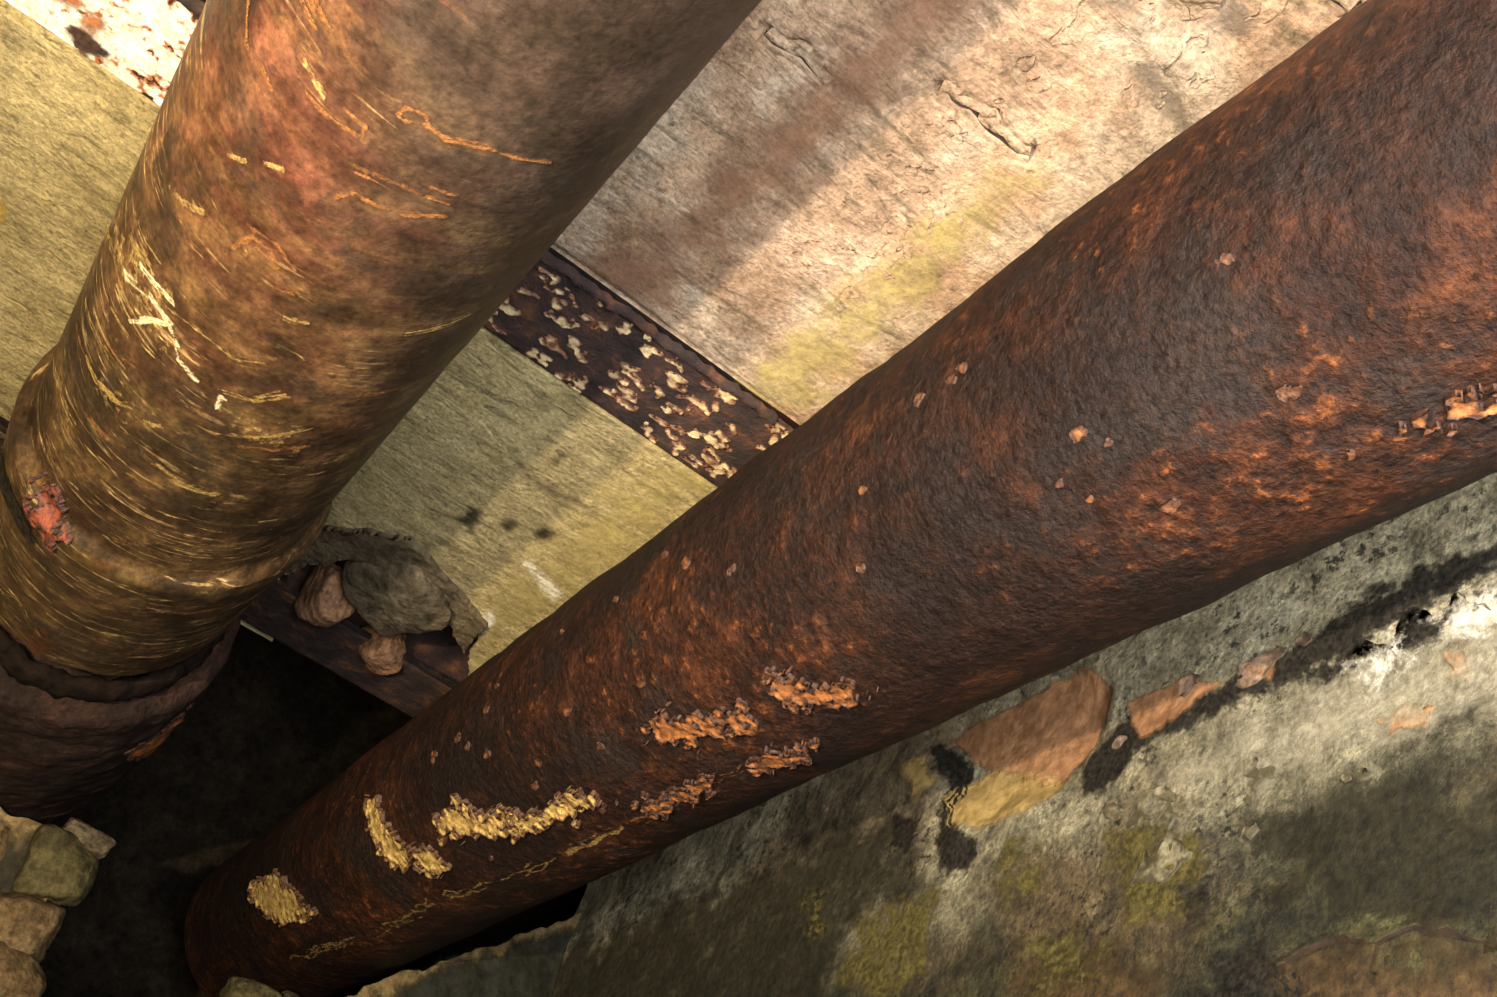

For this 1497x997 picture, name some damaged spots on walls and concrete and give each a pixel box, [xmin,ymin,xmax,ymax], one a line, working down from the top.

crack [1165,0,1222,20]
crack [1309,0,1359,18]
peeling [5,0,198,107]
crack [937,80,1032,164]
peeling [488,266,739,479]
peeling [755,422,790,450]
corrosion [760,665,879,715]
leakage [1082,545,1497,795]
corrosion [363,697,820,931]
corrosion [247,868,319,928]
leakage [377,743,977,997]
leakage [1195,941,1497,997]